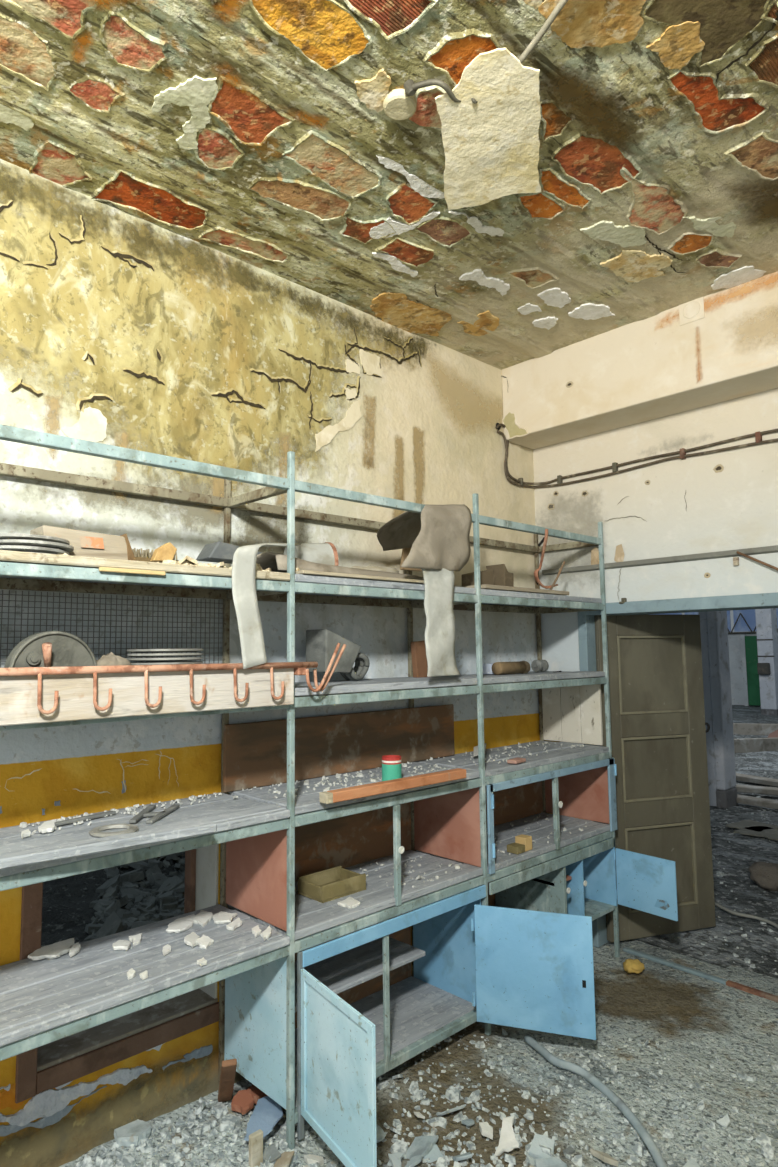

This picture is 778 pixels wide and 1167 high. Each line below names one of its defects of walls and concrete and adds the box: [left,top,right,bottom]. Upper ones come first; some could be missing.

spalling [0,0,169,113]
spalling [152,75,296,171]
spalling [247,0,438,72]
spalling [405,28,501,130]
spalling [523,0,778,181]
spalling [515,100,742,283]
crack [0,215,155,271]
crack [8,378,44,397]
crack [76,393,113,410]
crack [82,349,165,385]
leakage [0,167,425,528]
crack [210,328,422,430]